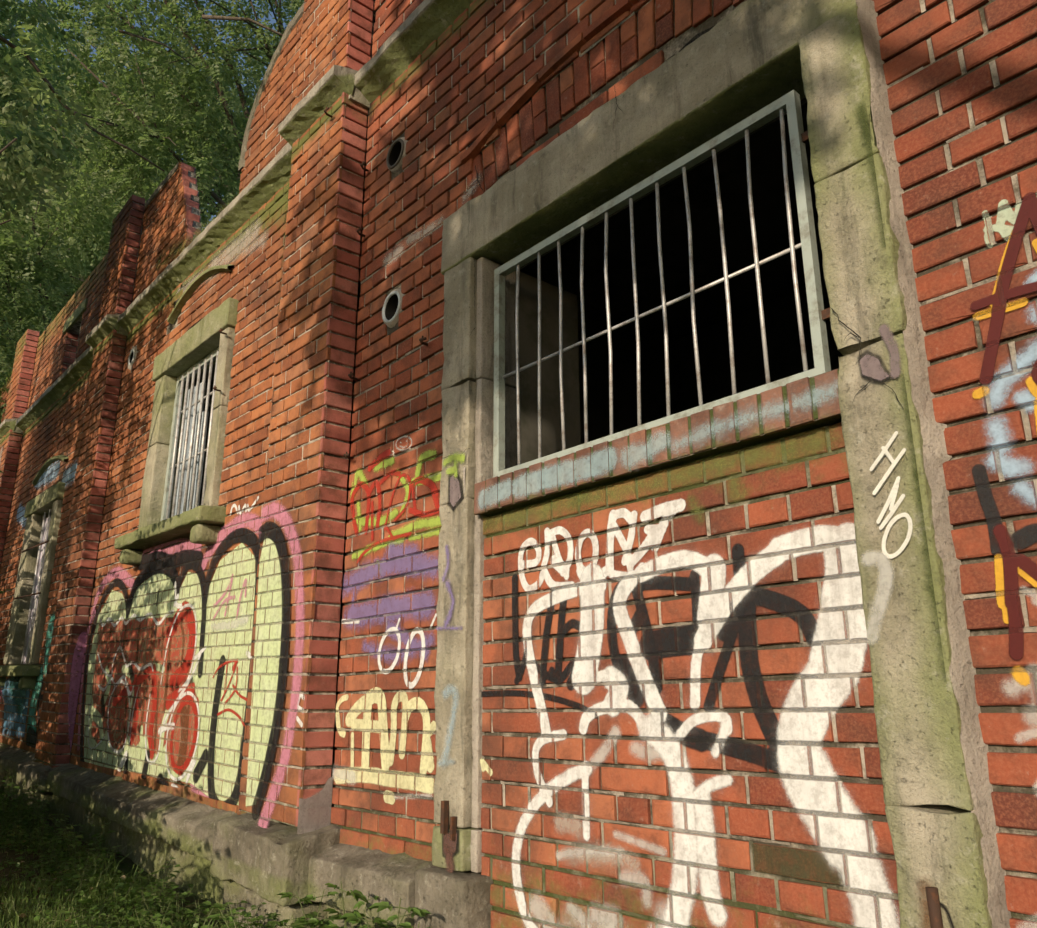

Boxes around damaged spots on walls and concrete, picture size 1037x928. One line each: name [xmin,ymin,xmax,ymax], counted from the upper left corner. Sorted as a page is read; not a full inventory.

damp [384,217,442,263]
crack [831,308,861,356]
spalling [858,324,900,384]
rust [442,828,459,873]